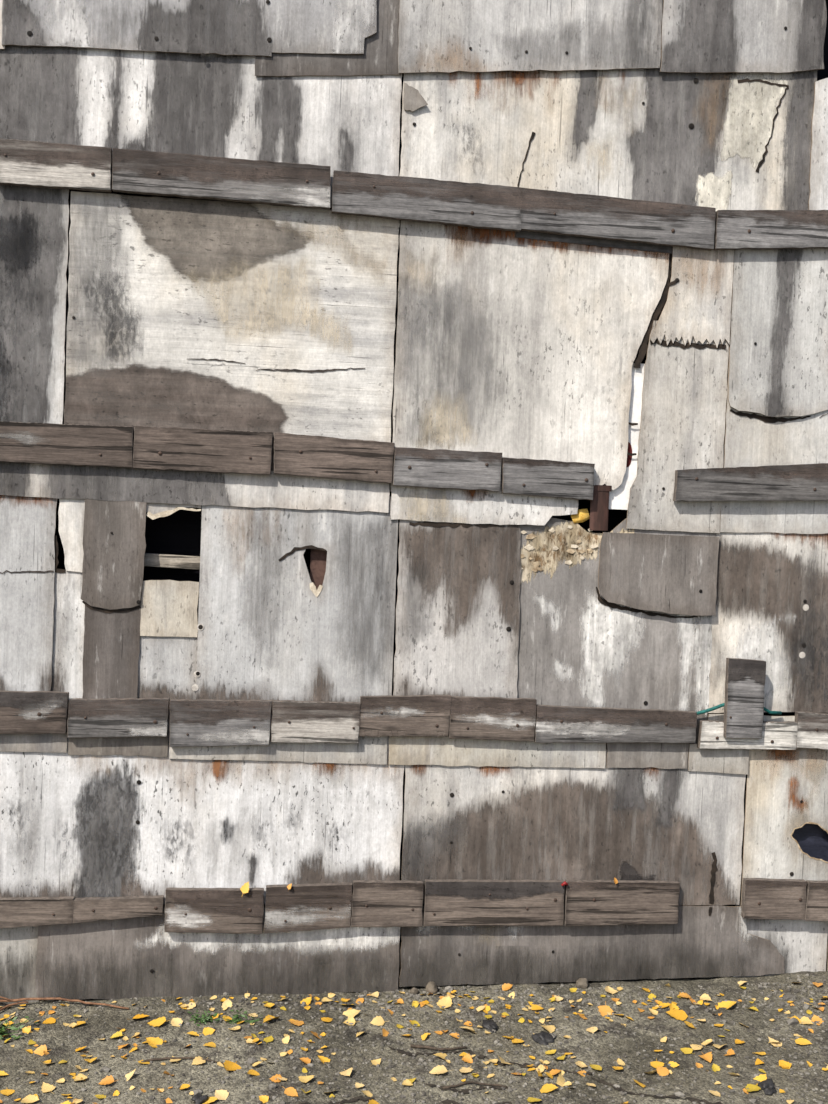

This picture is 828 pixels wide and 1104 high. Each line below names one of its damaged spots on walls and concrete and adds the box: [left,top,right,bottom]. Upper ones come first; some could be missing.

water stain [0,0,828,225]
crack [517,132,535,187]
crack [738,78,789,172]
water stain [0,185,132,423]
crack [634,254,680,368]
water stain [64,336,288,471]
crack [195,358,365,373]
spalling [146,507,201,520]
spalling [309,582,323,597]
spalling [520,520,634,584]
water stain [0,764,737,916]
corrosion [789,778,806,811]